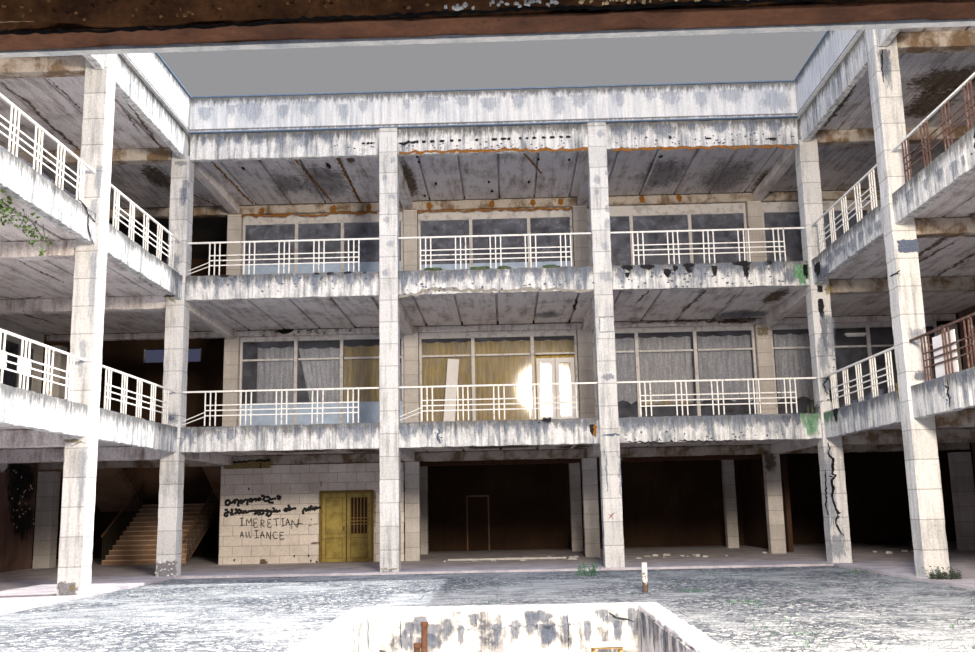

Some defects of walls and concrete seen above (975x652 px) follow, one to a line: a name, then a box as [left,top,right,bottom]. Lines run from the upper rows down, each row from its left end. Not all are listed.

damp [825,85,856,127]
damp [879,49,975,122]
corrosion [399,147,588,174]
corrosion [211,158,377,218]
corrosion [417,198,573,213]
peeling [897,239,920,253]
damp [620,299,899,433]
crack [825,443,844,536]
damp [399,607,695,652]